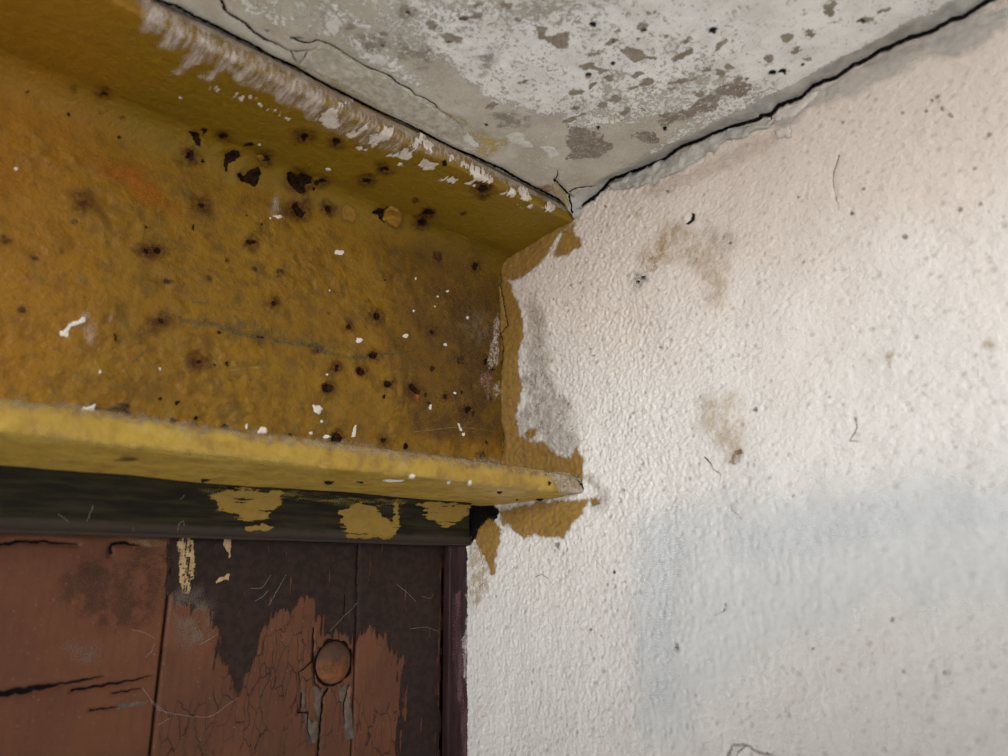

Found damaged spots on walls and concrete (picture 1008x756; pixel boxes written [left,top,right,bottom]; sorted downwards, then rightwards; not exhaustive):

peeling [459,2,483,20]
peeling [426,20,463,43]
crack [157,0,996,219]
corrosion [185,148,205,164]
corrosion [472,181,493,198]
corrosion [413,198,434,230]
corrosion [137,245,161,259]
corrosion [356,351,378,376]
peeling [546,472,599,506]
peeling [245,523,273,532]
peeling [176,538,196,594]
crack [0,675,152,711]